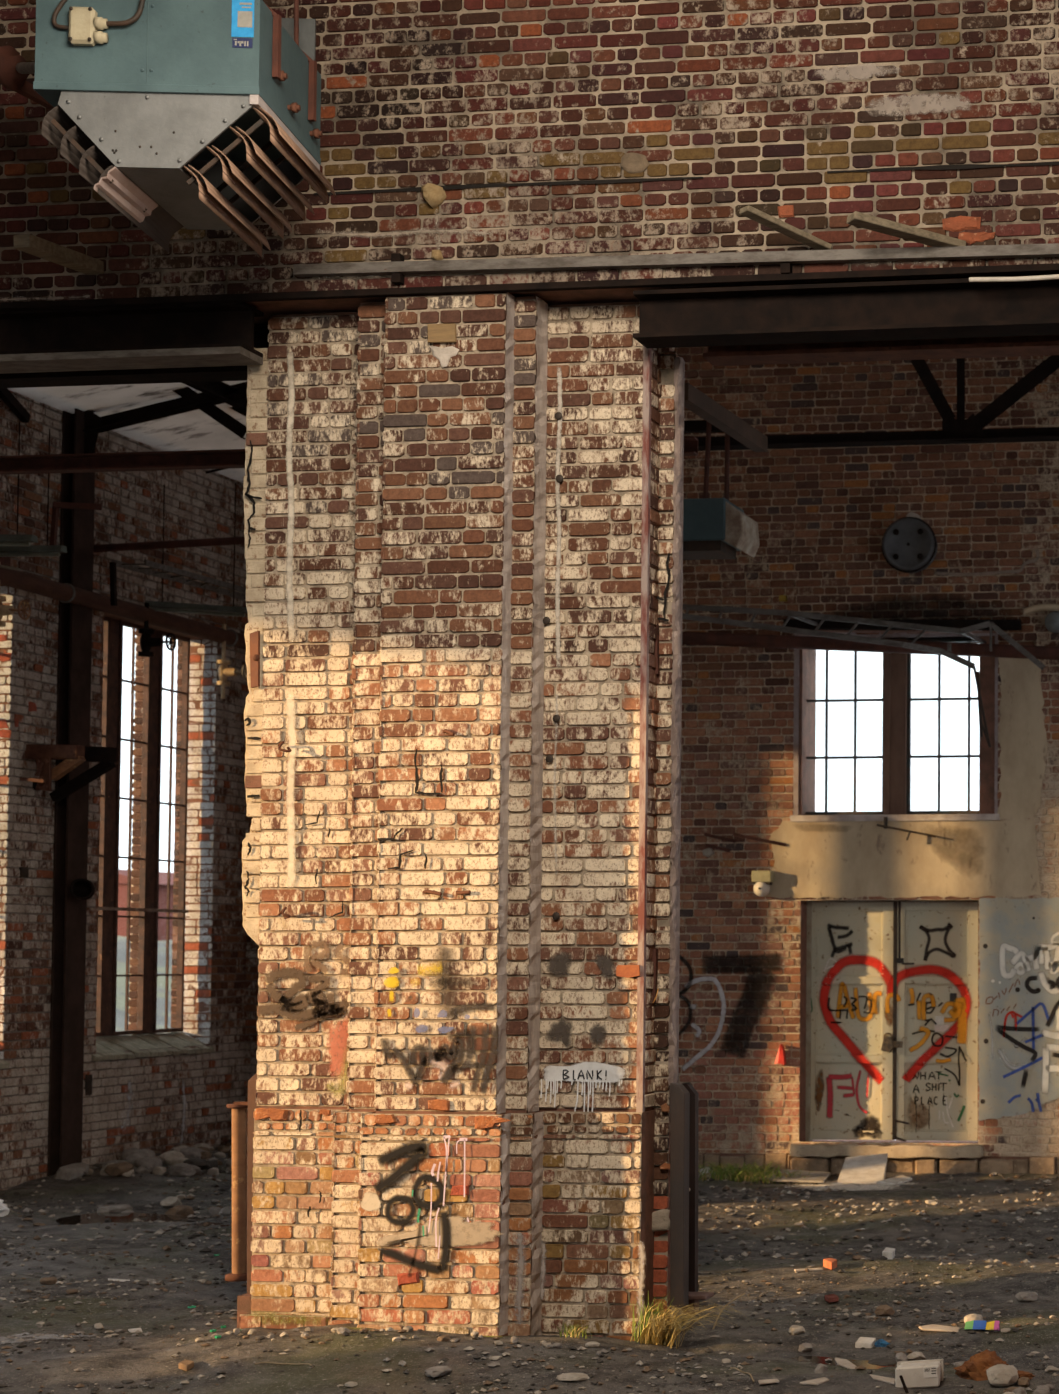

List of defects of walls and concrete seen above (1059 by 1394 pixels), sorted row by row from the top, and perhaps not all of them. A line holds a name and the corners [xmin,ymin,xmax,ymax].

crack [244,440,262,548]